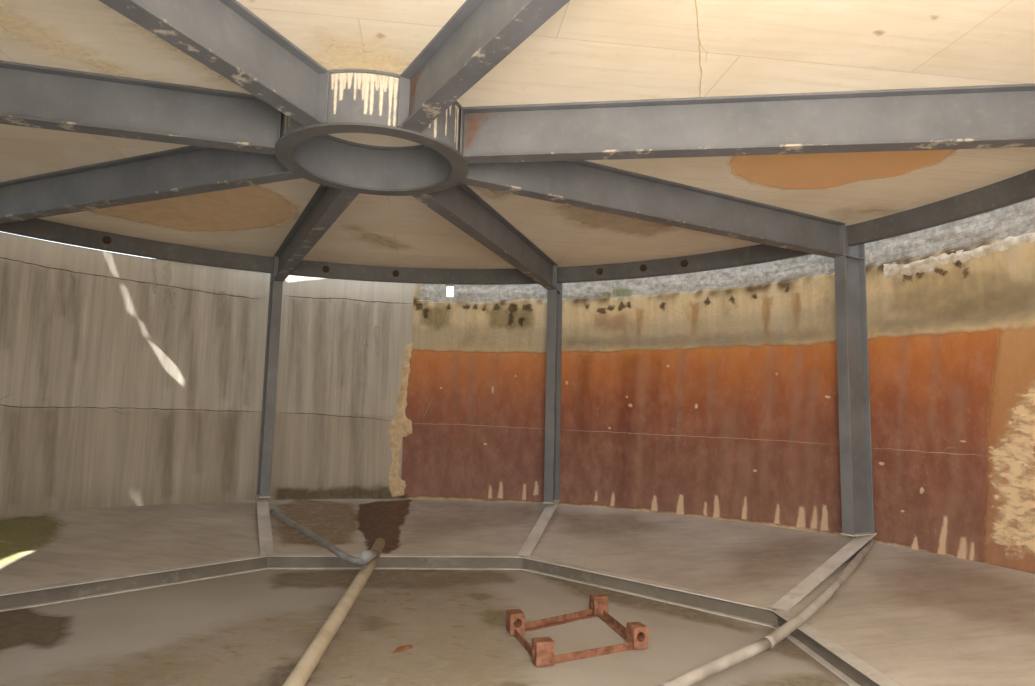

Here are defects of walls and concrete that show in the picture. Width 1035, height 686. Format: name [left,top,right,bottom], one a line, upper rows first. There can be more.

damp [331,63,399,126]
crack [695,0,708,96]
peeling [92,185,294,231]
peeling [731,149,955,189]
damp [447,304,532,326]
crack [0,396,254,414]
spalling [388,343,413,498]
corrosion [358,350,546,553]
corrosion [559,341,842,533]
corrosion [868,328,1035,573]
peeling [989,386,1035,556]
damp [0,609,68,649]